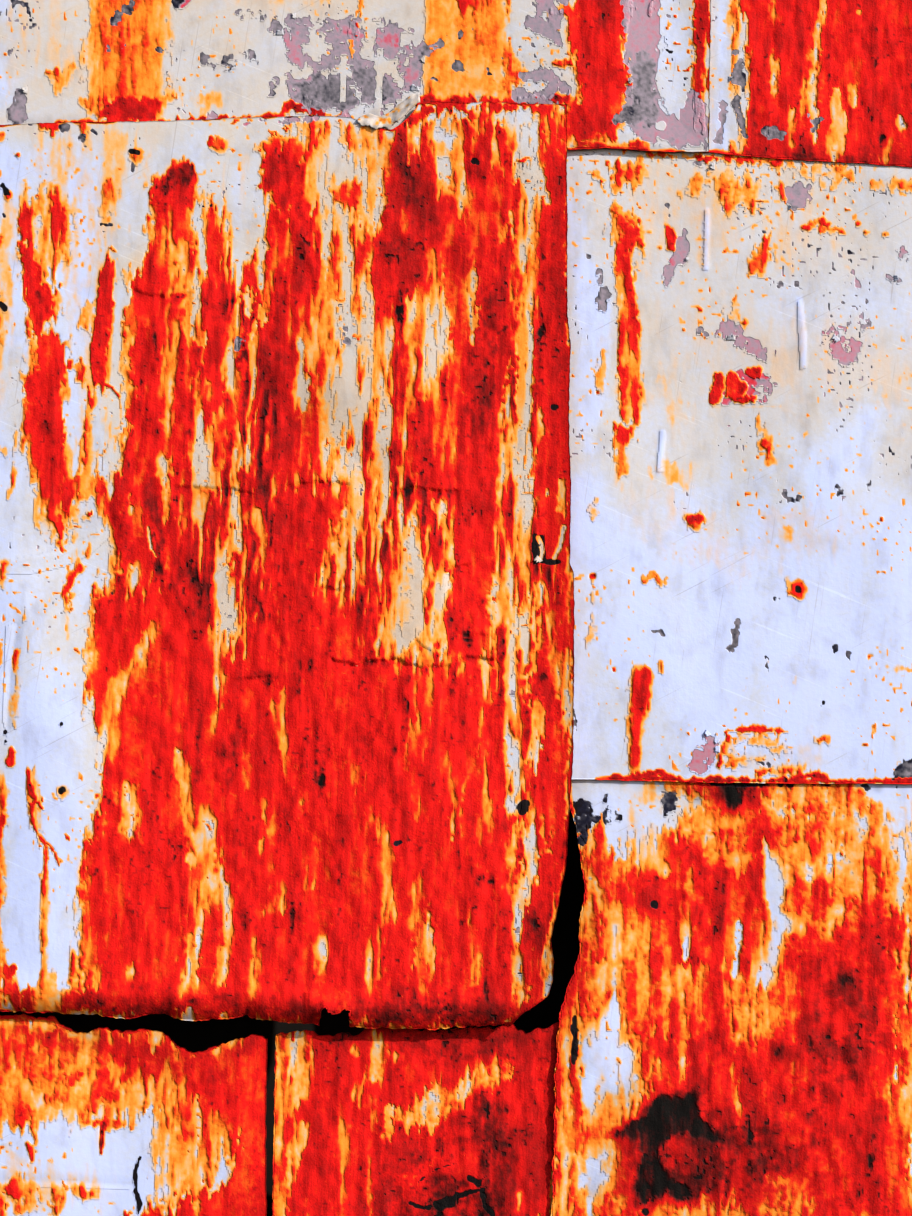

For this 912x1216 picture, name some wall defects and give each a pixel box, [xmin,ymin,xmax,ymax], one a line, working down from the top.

peeling [199,50,259,72]
peeling [235,10,431,130]
peeling [512,66,572,104]
peeling [524,0,571,48]
rust [552,0,651,149]
peeling [613,0,715,172]
rust [678,0,912,219]
rust [603,200,648,479]
rust [0,0,574,1029]
rust [610,664,685,781]
rust [273,762,912,1216]
rust [0,1015,266,1216]